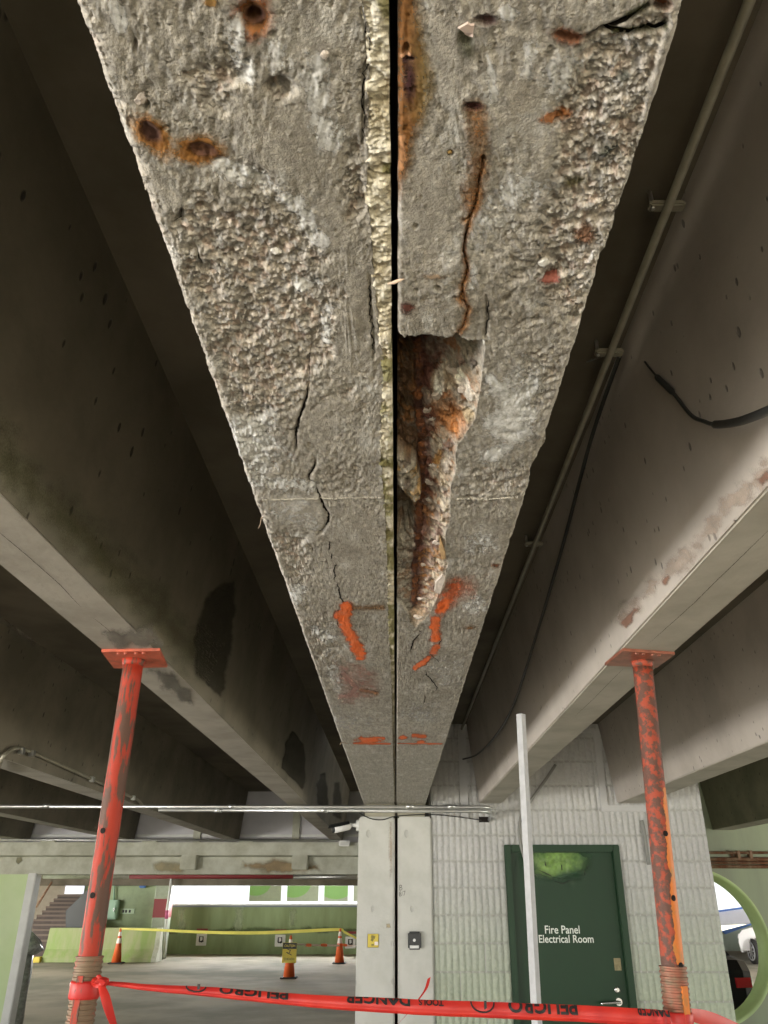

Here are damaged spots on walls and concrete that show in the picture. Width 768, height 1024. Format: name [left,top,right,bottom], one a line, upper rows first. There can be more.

rust [133,118,222,164]
rust [235,0,269,39]
rust [398,0,431,190]
rust [456,102,486,334]
crack [461,177,489,335]
crack [593,8,667,32]
crack [291,343,344,628]
spalling [397,284,485,627]
leakage [194,583,236,696]
leakage [282,731,341,819]